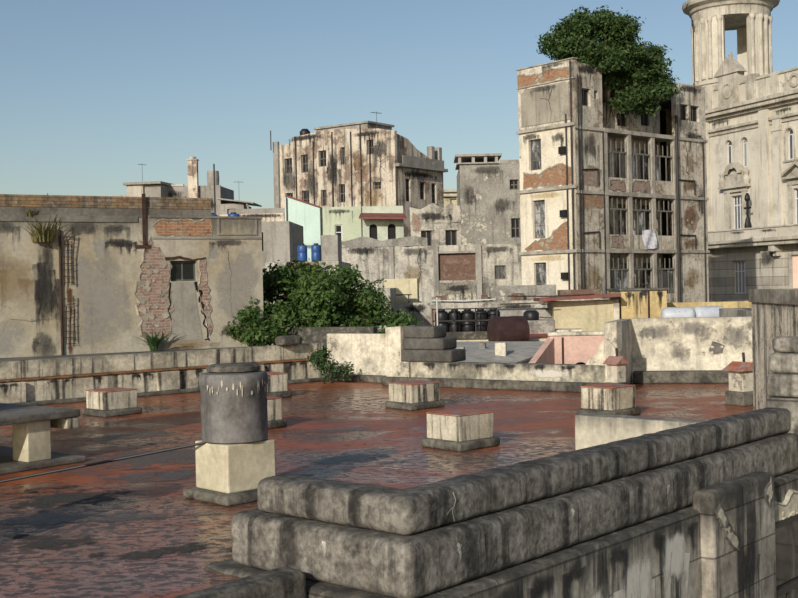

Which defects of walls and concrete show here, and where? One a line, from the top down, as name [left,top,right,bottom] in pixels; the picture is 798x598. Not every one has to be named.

spalling [517,66,569,88]
damp [284,167,294,189]
damp [327,155,341,183]
damp [357,131,387,161]
spalling [523,163,604,209]
damp [0,200,214,251]
spalling [525,221,568,252]
damp [34,244,60,317]
spalling [133,218,214,340]
crack [194,282,210,341]
damp [32,335,54,356]
damp [654,534,672,598]